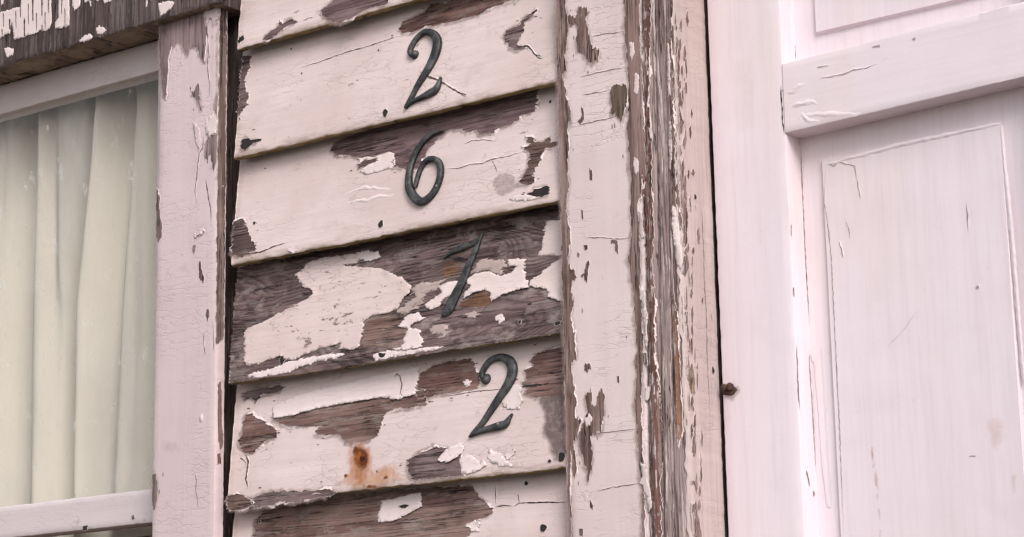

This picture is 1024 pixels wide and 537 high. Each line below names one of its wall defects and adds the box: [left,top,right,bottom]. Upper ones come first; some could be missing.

peeling [0,0,609,537]
corrosion [344,447,391,488]
peeling [609,0,703,537]
crack [791,160,861,532]